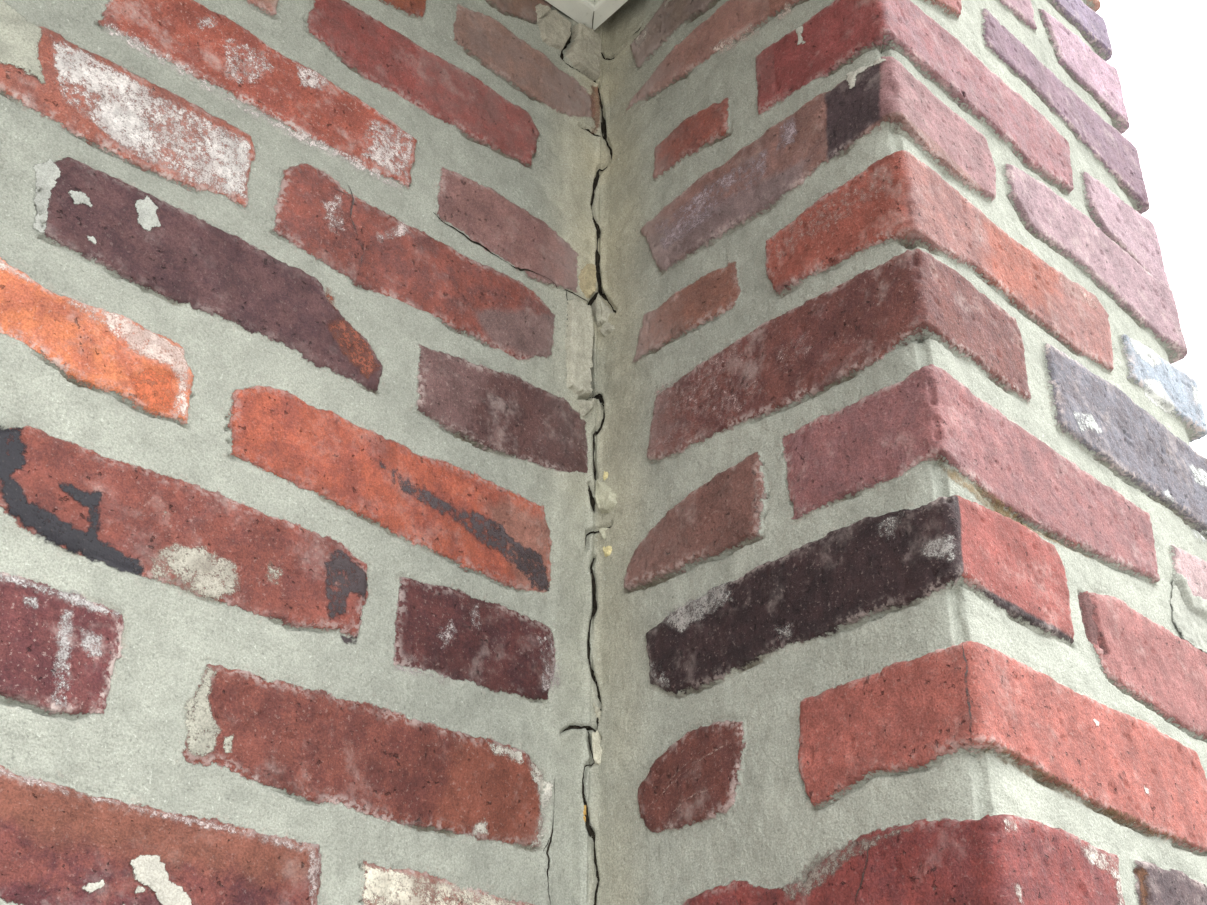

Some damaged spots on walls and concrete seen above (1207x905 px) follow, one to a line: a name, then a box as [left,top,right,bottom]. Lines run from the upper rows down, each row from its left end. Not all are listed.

water stain [105,24,211,91]
water stain [225,39,273,82]
water stain [299,69,327,88]
peeling [68,190,92,207]
water stain [54,44,251,196]
water stain [228,98,412,188]
crack [433,0,616,334]
crack [543,391,612,905]
peeling [83,880,105,893]